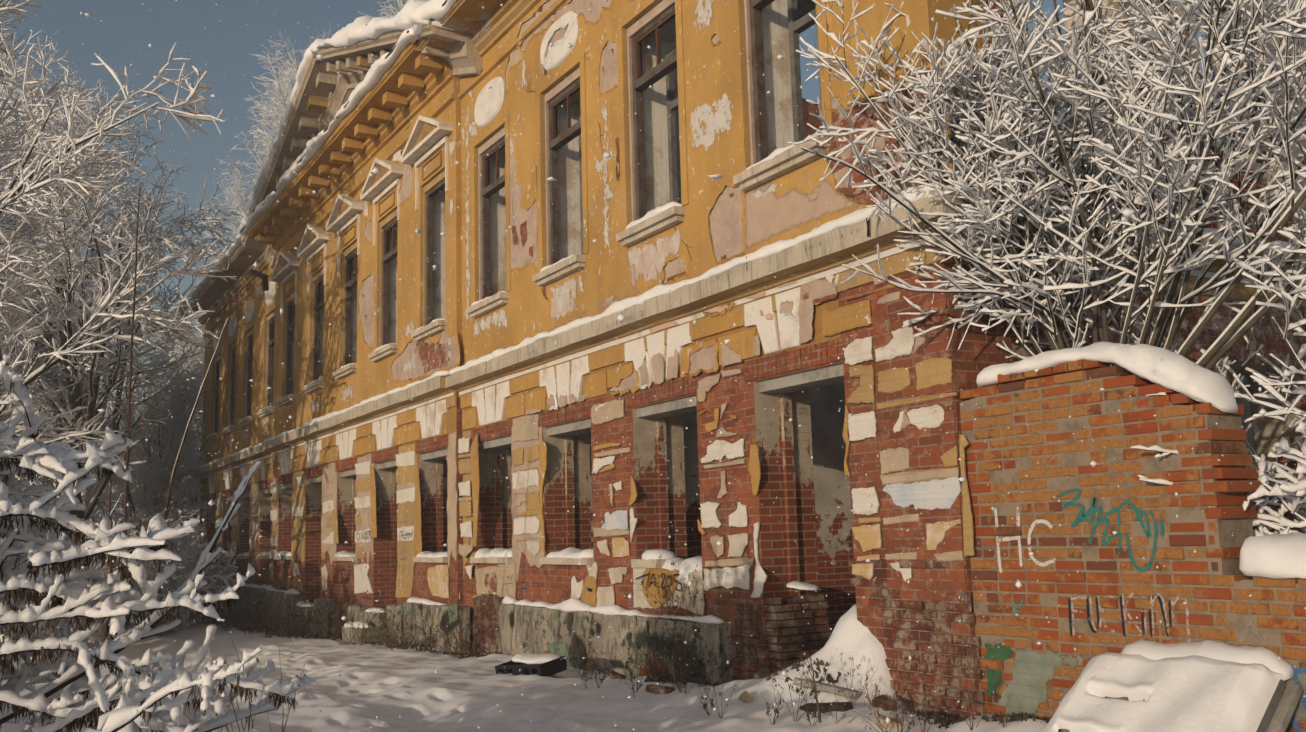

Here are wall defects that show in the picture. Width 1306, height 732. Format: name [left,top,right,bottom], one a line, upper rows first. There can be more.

spalling [504,114,540,272]
spalling [504,0,614,93]
spalling [591,39,618,258]
peeling [689,80,732,151]
spalling [707,182,747,265]
flaking render [819,0,953,207]
water stain [439,604,459,634]
flaking render [395,433,516,654]
water stain [567,613,705,679]
flaking render [512,334,767,616]
flaking render [702,271,975,582]
peeling [984,642,1091,717]